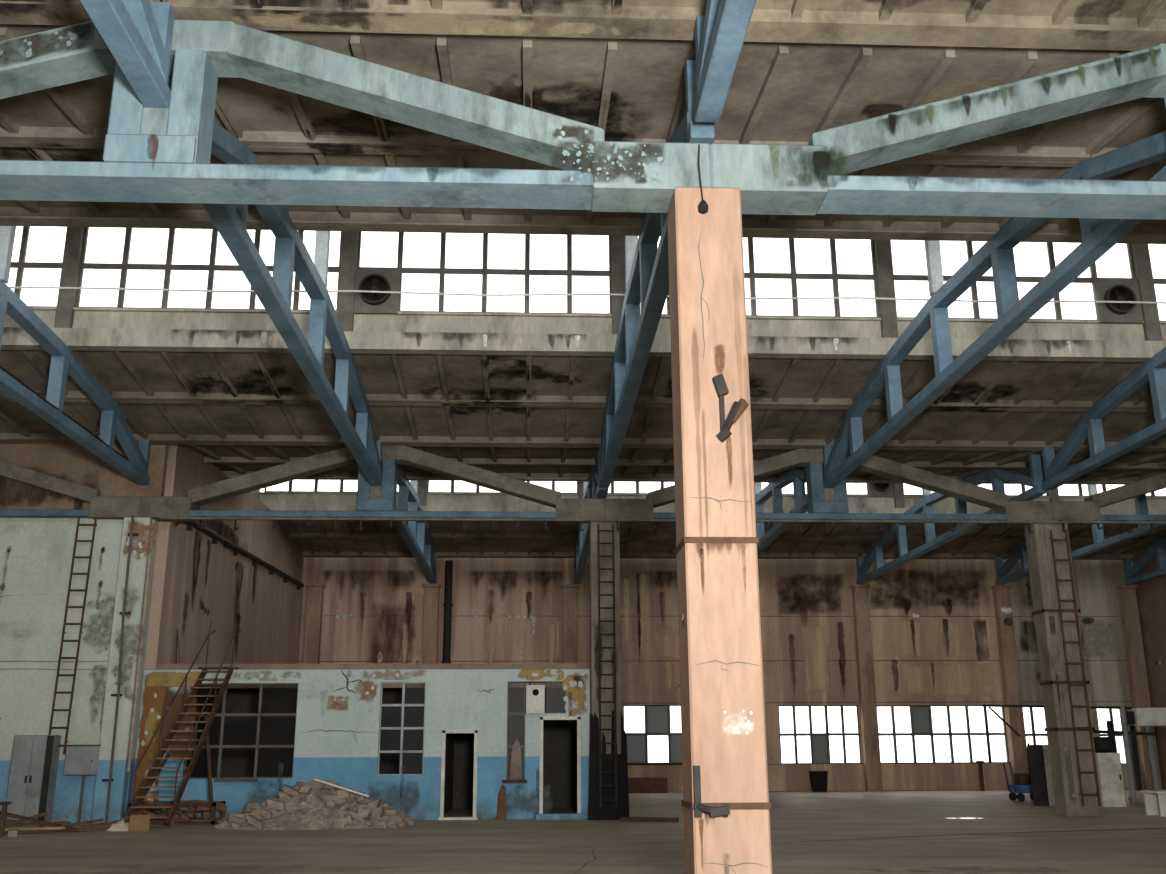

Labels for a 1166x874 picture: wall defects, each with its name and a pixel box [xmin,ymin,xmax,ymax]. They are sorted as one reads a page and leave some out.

water stain [862,81,1011,132]
water stain [1039,66,1085,92]
water stain [1098,50,1160,75]
peeling [552,125,666,183]
water stain [425,333,581,417]
water stain [371,572,424,664]
water stain [472,571,561,663]
water stain [90,666,105,729]
flaking render [328,652,424,710]
flaking render [518,669,588,716]